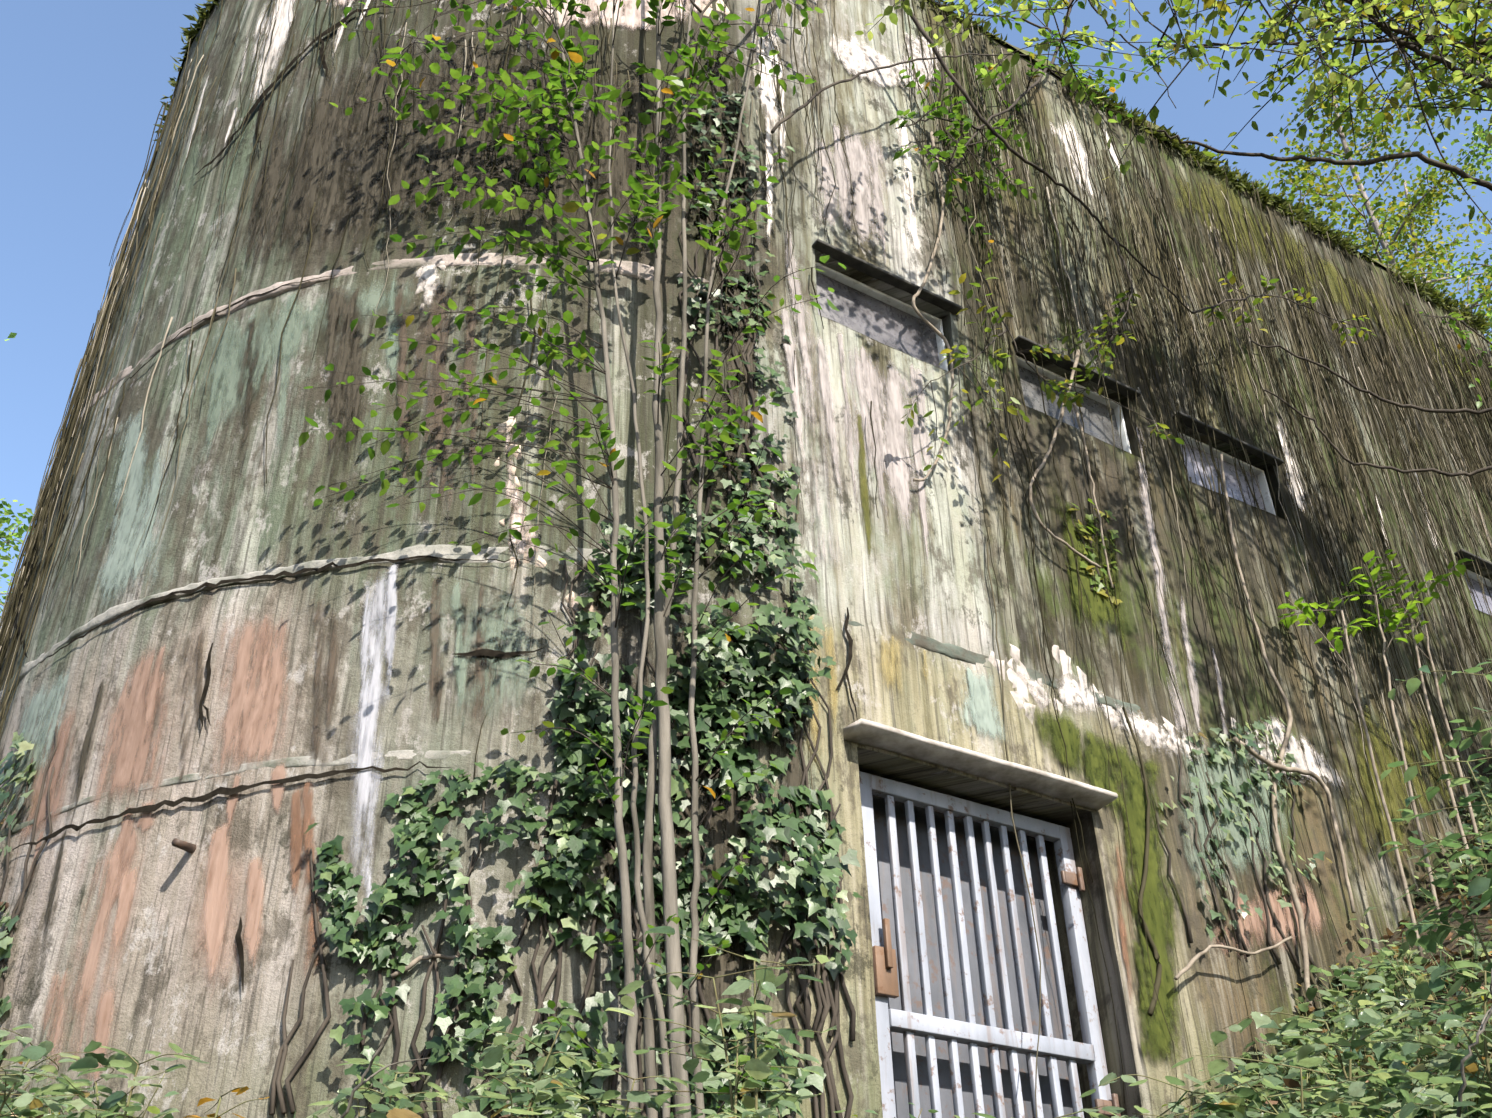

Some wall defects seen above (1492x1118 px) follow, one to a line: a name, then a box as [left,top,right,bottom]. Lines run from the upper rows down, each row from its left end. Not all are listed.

leakage [1052,124,1093,195]
leakage [1278,422,1304,509]
leakage [1112,538,1125,650]
leakage [1136,427,1211,849]
leakage [357,565,397,825]
leakage [1213,649,1233,758]
corrosion [24,713,74,878]
crack [12,761,452,851]
corrosion [205,617,317,975]
corrosion [45,646,167,1080]
leakage [1124,816,1138,920]